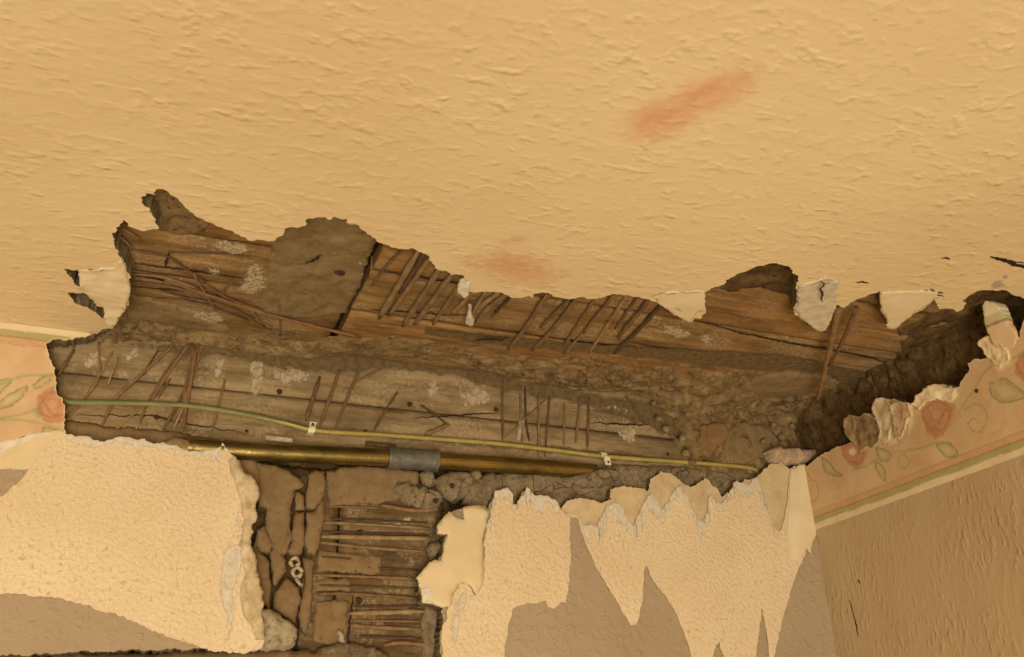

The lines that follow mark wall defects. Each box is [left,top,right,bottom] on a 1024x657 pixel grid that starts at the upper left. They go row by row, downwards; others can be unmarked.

peeling [78,257,131,330]
peeling [457,277,470,299]
peeling [655,290,706,323]
peeling [795,276,838,332]
peeling [879,290,938,330]
peeling [977,301,1019,368]
peeling [843,384,958,452]
peeling [0,431,265,654]
peeling [416,462,816,657]